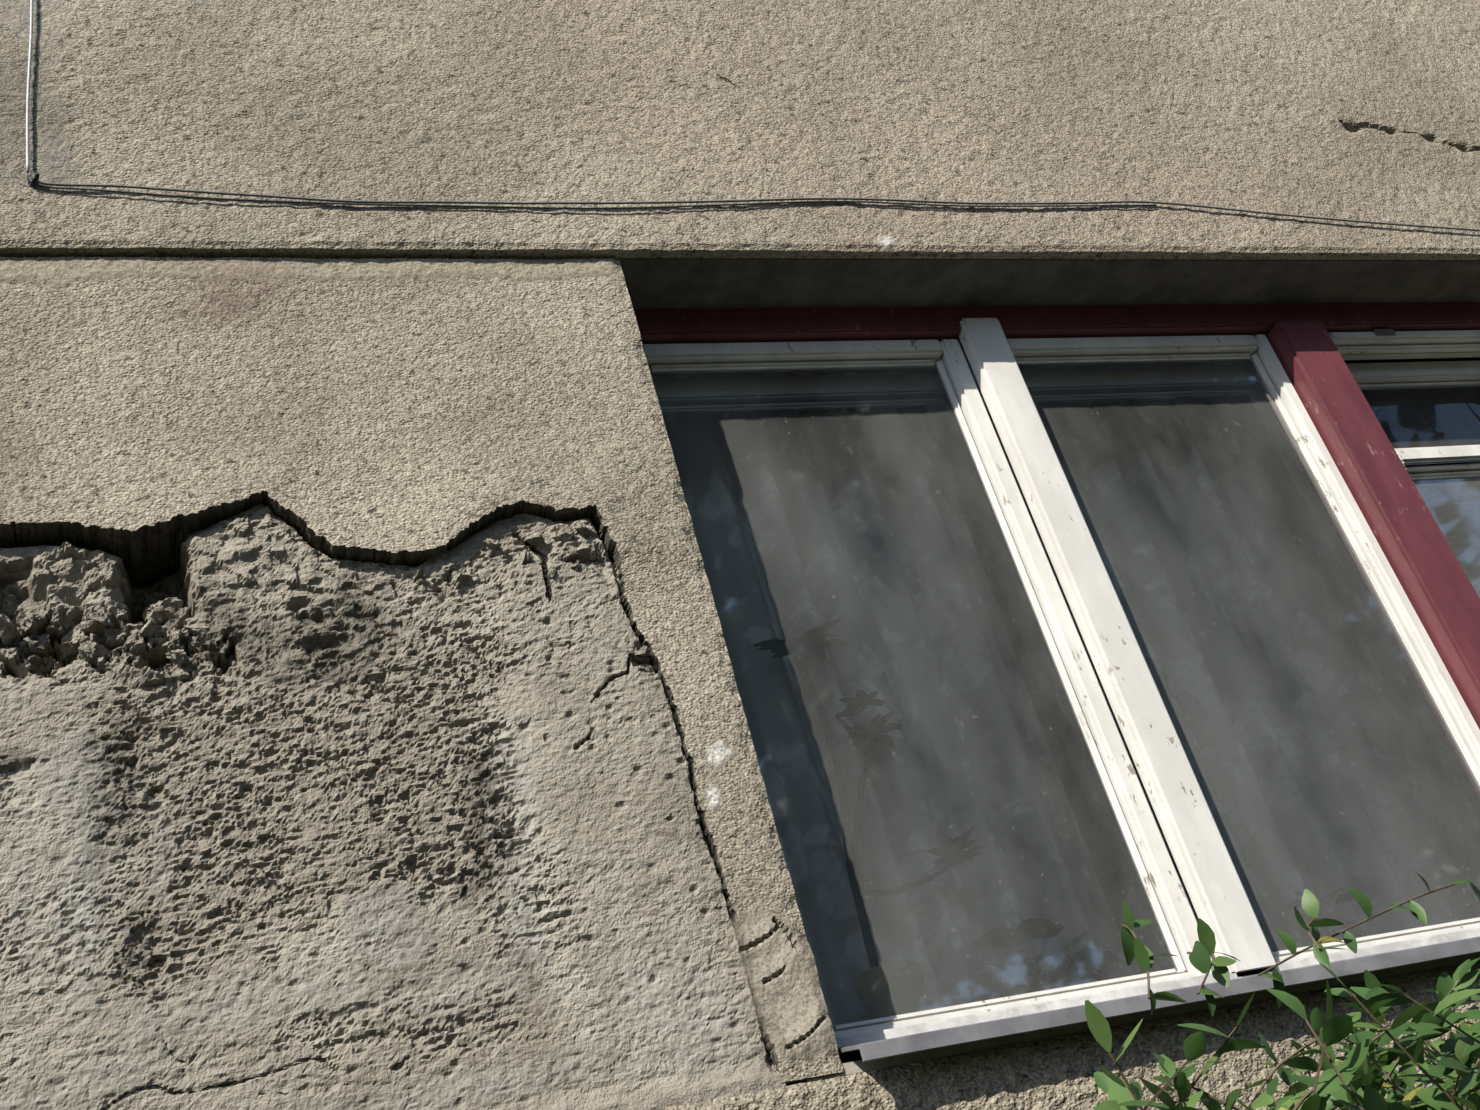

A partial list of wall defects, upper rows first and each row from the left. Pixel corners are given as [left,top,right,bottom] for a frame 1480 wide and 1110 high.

crack [516,535,551,599]
crack [100,1018,337,1110]
flaking render [0,504,832,1110]
crack [595,655,819,1072]